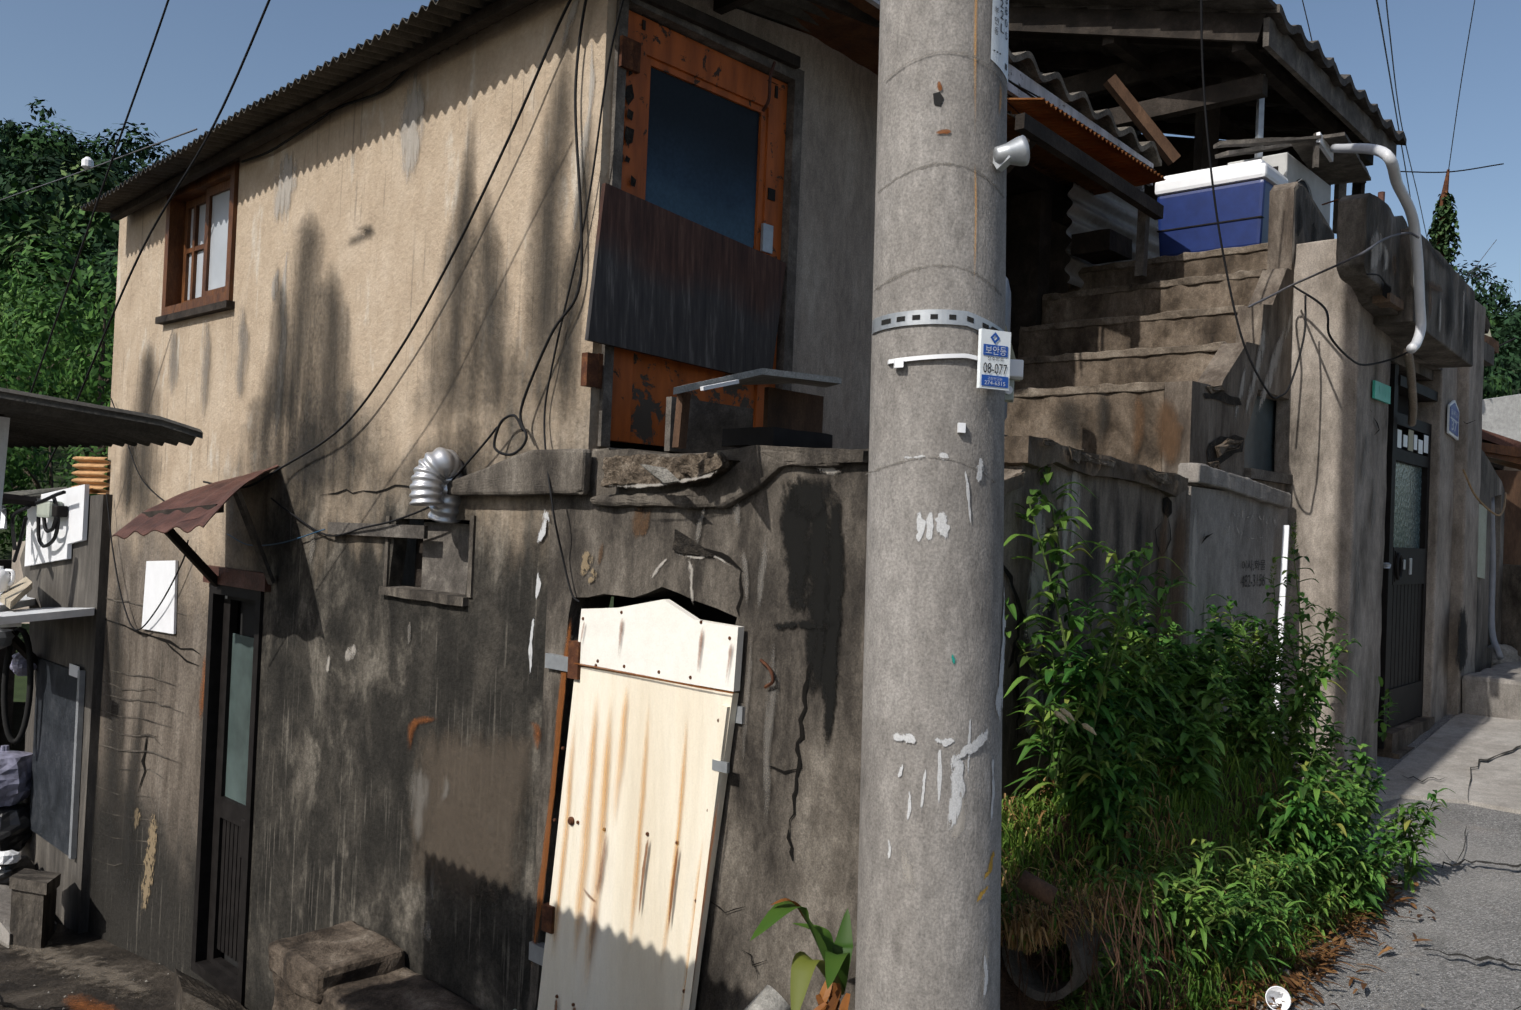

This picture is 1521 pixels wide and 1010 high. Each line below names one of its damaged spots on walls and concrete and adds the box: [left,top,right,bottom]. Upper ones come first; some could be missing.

damp [274,154,296,218]
damp [201,326,210,406]
damp [261,228,351,483]
damp [432,163,510,409]
damp [743,475,845,741]
crack [0,1002,78,1010]
peeling [133,808,157,909]
rust [533,624,734,944]
rust [684,815,716,1000]
crack [763,663,812,862]
crack [1402,745,1521,868]
crack [1424,949,1521,966]